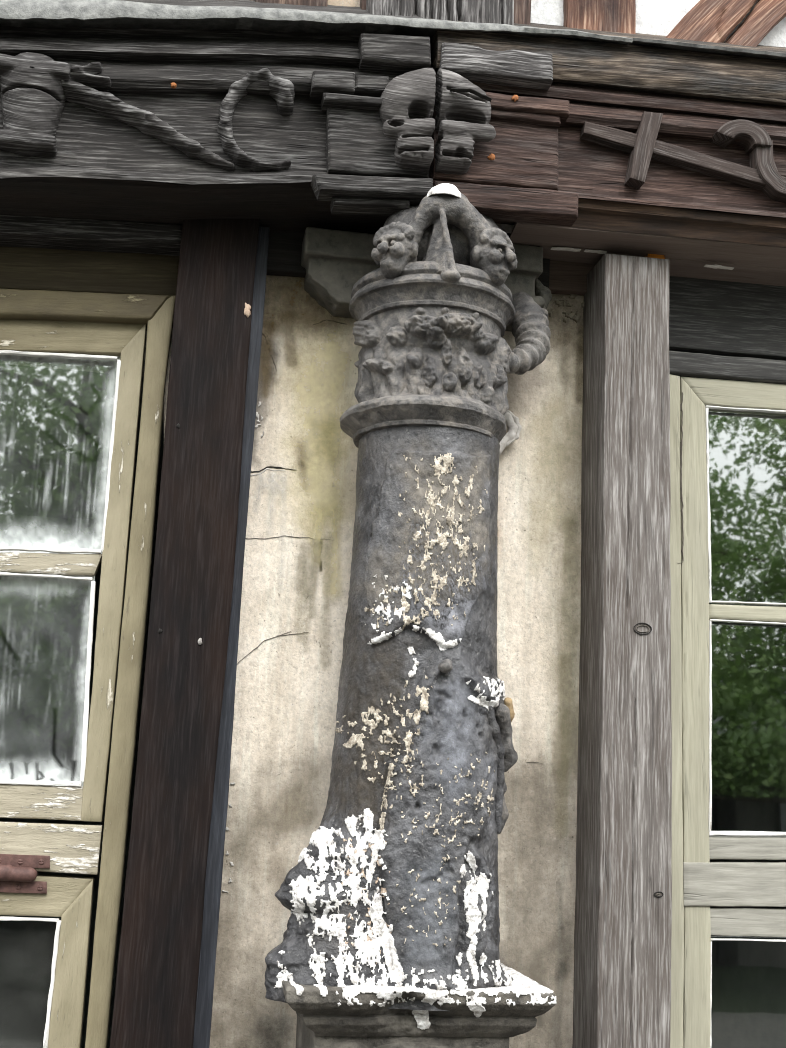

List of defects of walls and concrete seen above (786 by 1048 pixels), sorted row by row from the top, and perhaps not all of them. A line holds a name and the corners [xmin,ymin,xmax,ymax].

crack [251,466,294,476]
crack [246,534,336,542]
peeling [364,452,487,651]
crack [237,631,309,664]
spalling [274,647,556,1030]